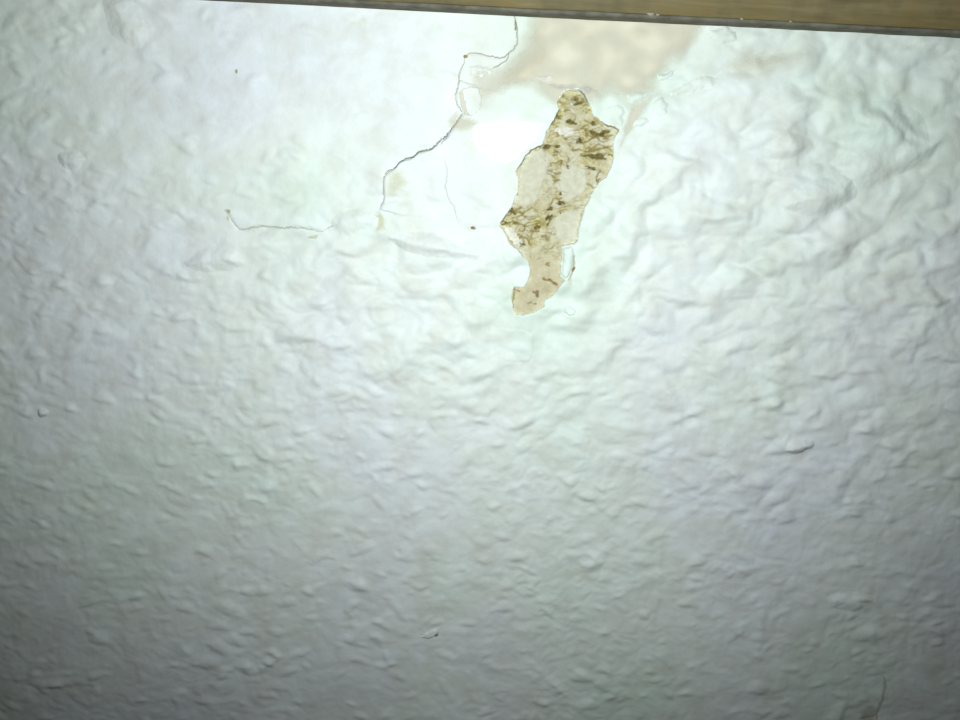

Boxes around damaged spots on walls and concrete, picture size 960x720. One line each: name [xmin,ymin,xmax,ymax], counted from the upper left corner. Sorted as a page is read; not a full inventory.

crack [464,16,518,66]
leakage [505,17,738,132]
crack [385,115,461,174]
flaking render [500,90,619,314]